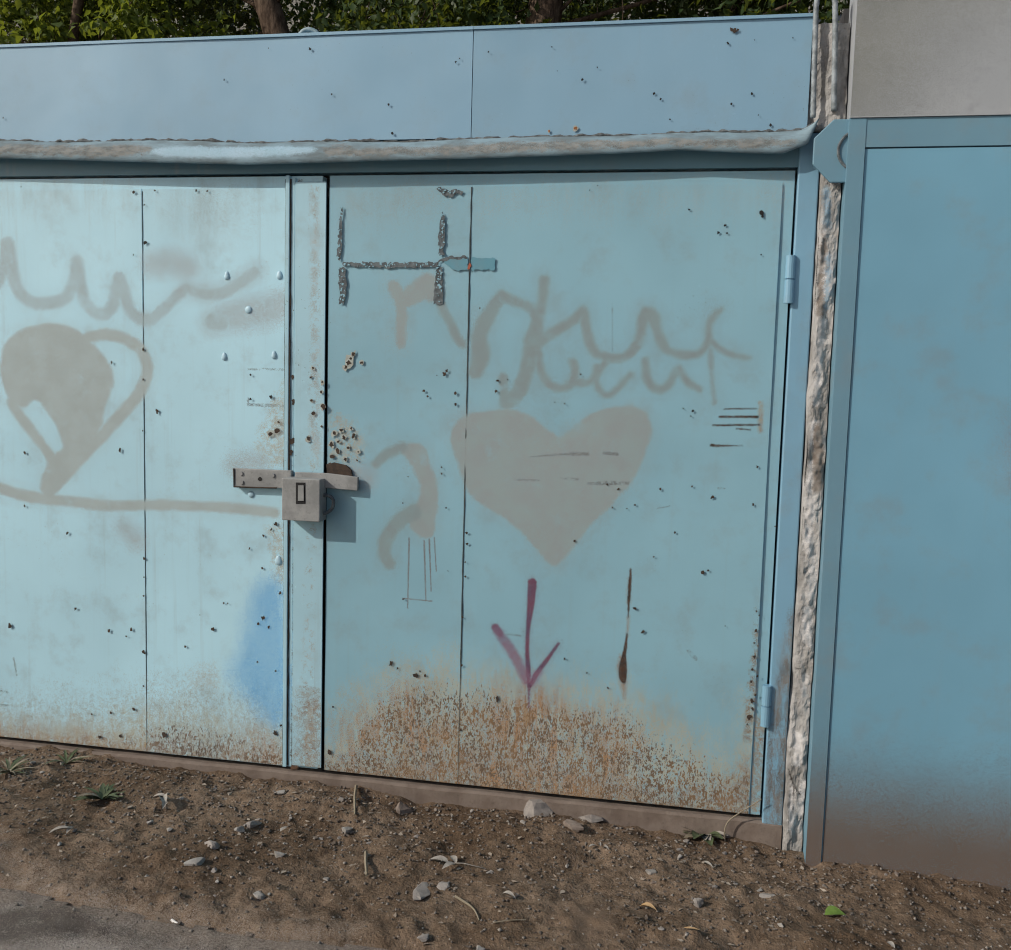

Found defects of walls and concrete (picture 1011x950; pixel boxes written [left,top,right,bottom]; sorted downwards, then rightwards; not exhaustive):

peeling [437,187,463,198]
peeling [336,207,496,305]
corrosion [0,524,764,815]